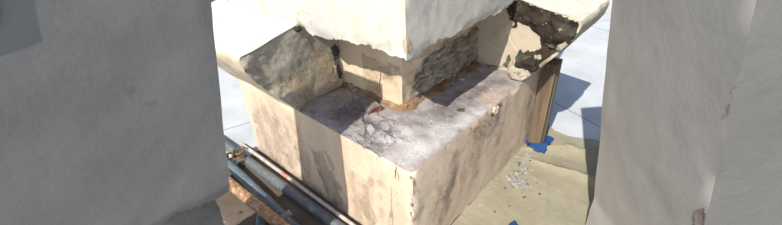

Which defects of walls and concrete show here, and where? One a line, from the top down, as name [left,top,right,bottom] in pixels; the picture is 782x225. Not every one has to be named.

spalling [402,27,479,102]
peeling [502,0,579,81]
peeling [339,113,393,155]
spalling [692,208,707,225]